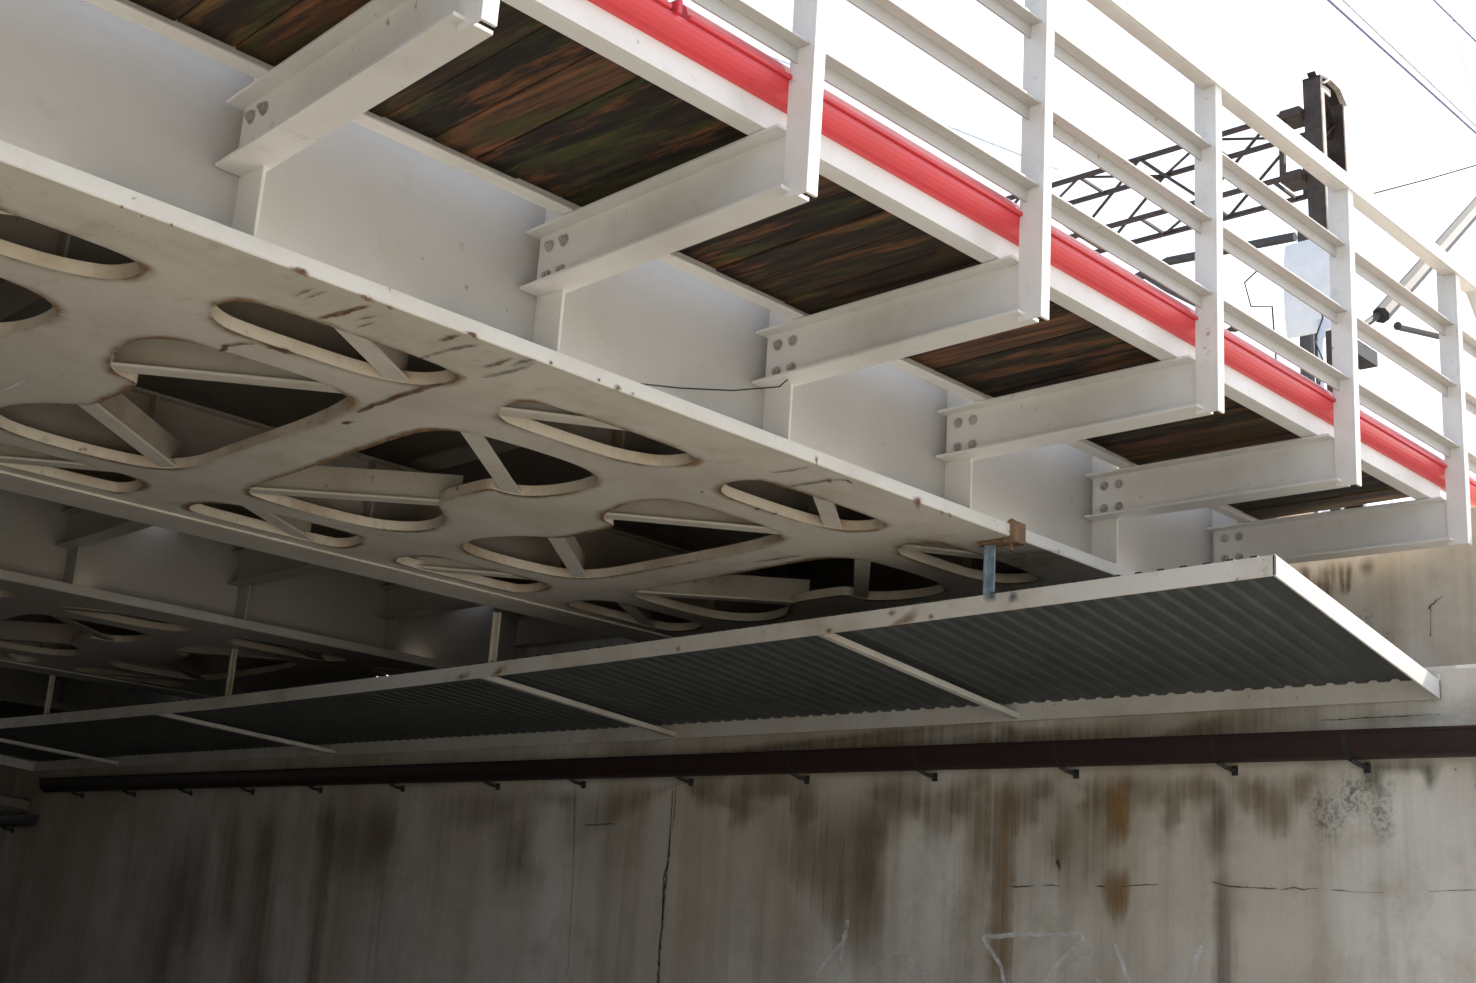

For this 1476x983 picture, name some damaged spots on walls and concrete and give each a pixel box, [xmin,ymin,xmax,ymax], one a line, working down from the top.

rust [1108,790,1128,835]
crack [657,788,676,983]
crack [1211,881,1384,893]